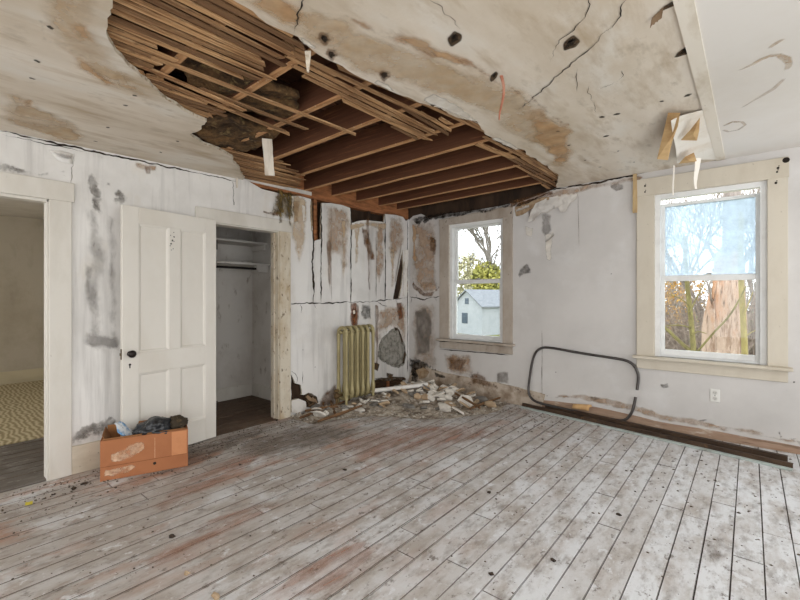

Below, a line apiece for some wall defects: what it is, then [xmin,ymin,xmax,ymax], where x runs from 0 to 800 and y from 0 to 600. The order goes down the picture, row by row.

leakage [258,0,570,164]
flaking render [448,31,462,46]
crack [516,0,626,110]
peeling [650,1,674,28]
crack [4,131,234,202]
leakage [356,219,402,281]
peeling [515,193,578,260]
crack [294,200,439,371]
leakage [88,335,117,347]
flaking render [375,327,406,388]
leakage [410,310,502,386]
flaking render [291,383,318,413]